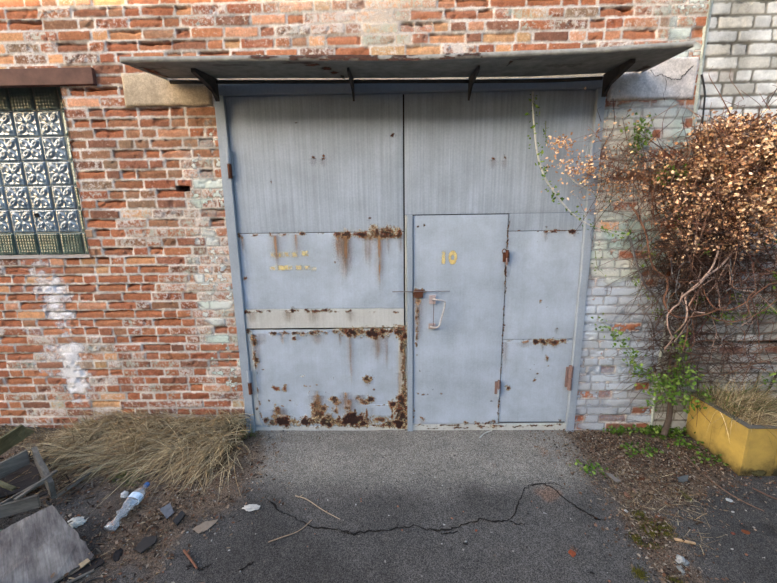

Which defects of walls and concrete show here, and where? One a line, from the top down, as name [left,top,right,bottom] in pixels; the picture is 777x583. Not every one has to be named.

rust [333,217,402,279]
efflorescence [30,262,91,402]
rust [256,288,561,429]
crack [269,482,601,536]